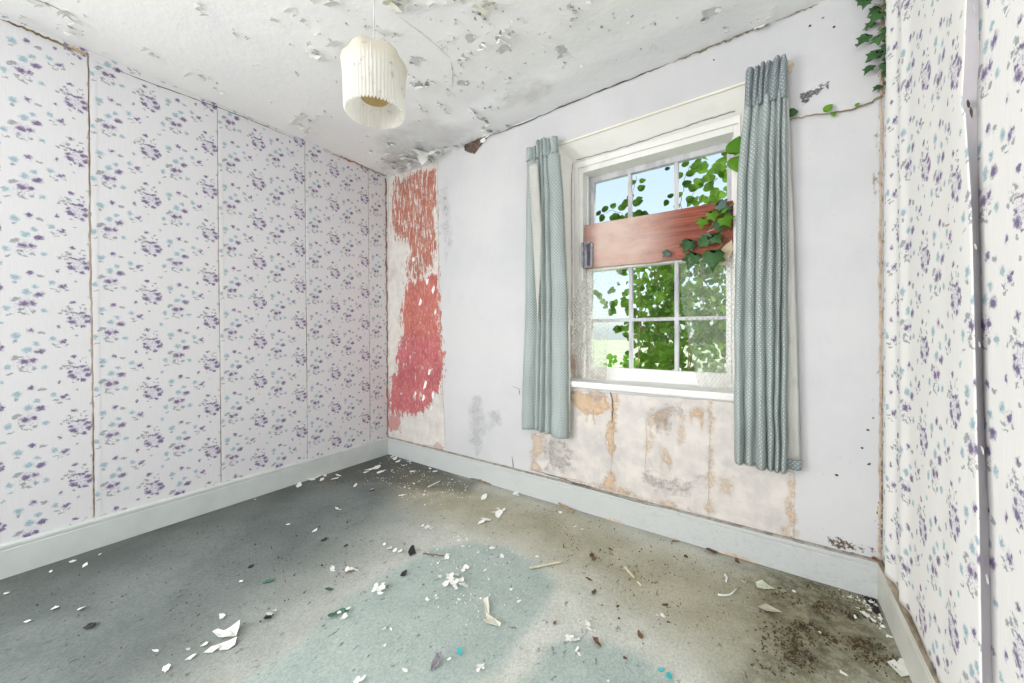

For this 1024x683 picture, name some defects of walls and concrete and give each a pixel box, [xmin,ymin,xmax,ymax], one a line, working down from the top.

peeling [18,0,88,36]
peeling [270,7,343,62]
peeling [308,0,399,42]
peeling [700,3,739,23]
peeling [358,0,584,449]
peeling [532,390,794,538]
water stain [828,460,883,553]